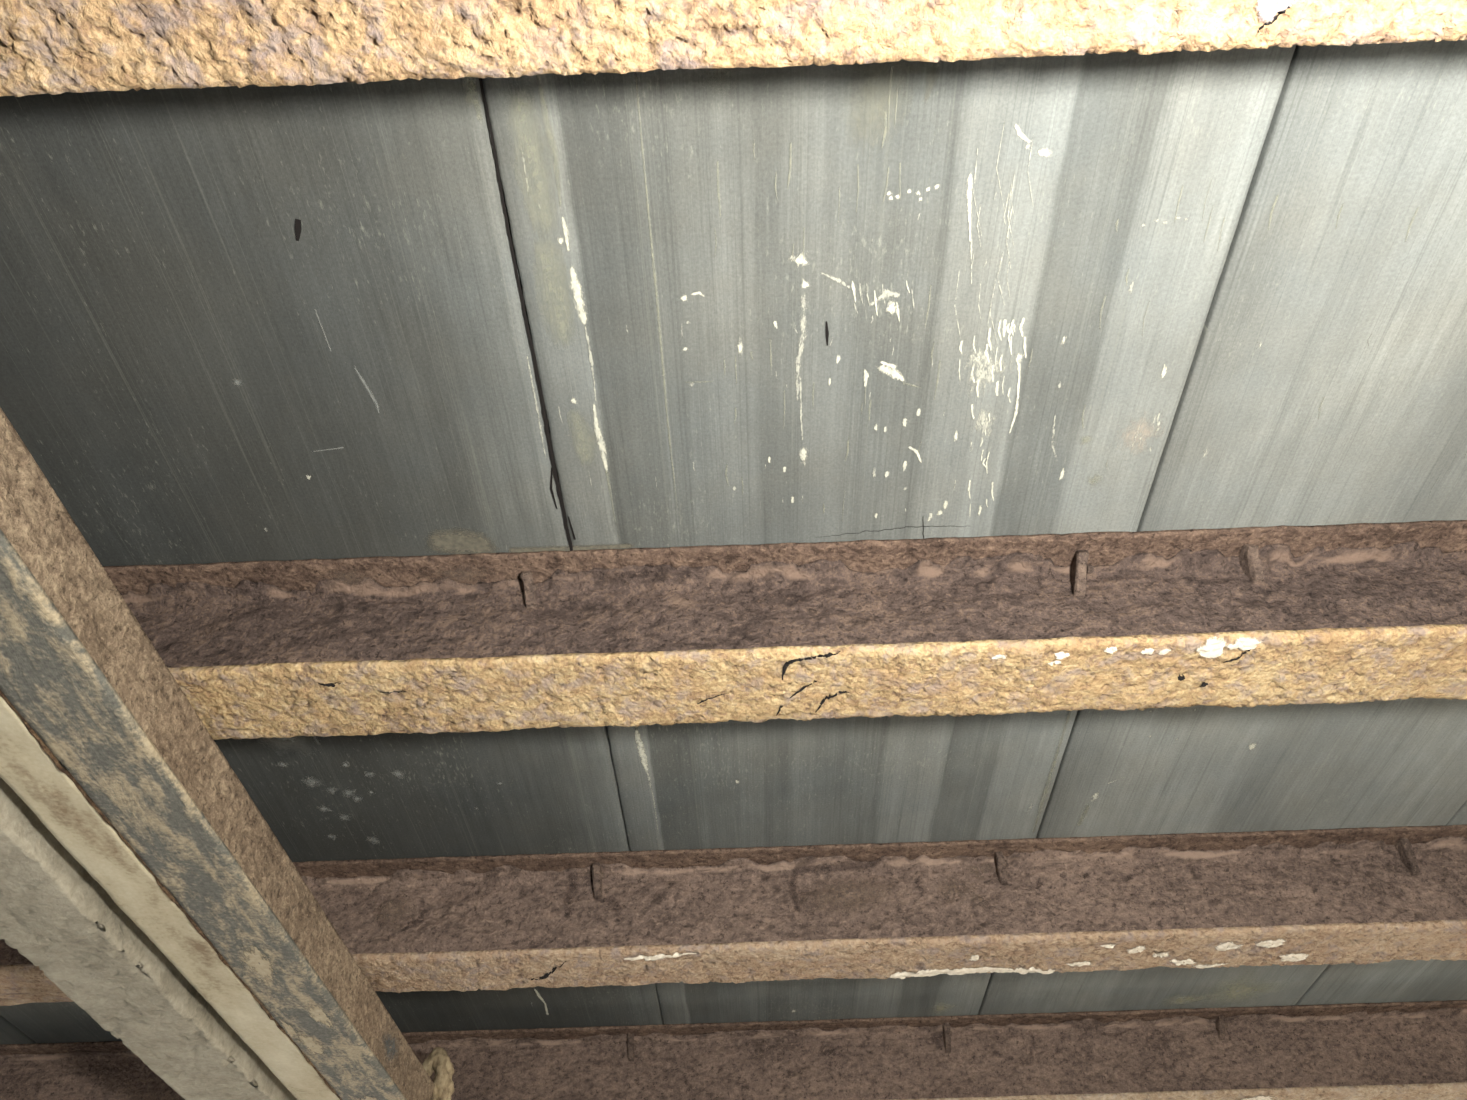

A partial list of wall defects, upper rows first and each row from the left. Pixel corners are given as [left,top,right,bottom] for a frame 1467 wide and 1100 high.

rust [1256,0,1295,22]
peeling [790,254,920,400]
peeling [959,318,1027,512]
crack [776,651,849,716]
rust [1048,651,1070,666]
rust [1100,939,1309,968]